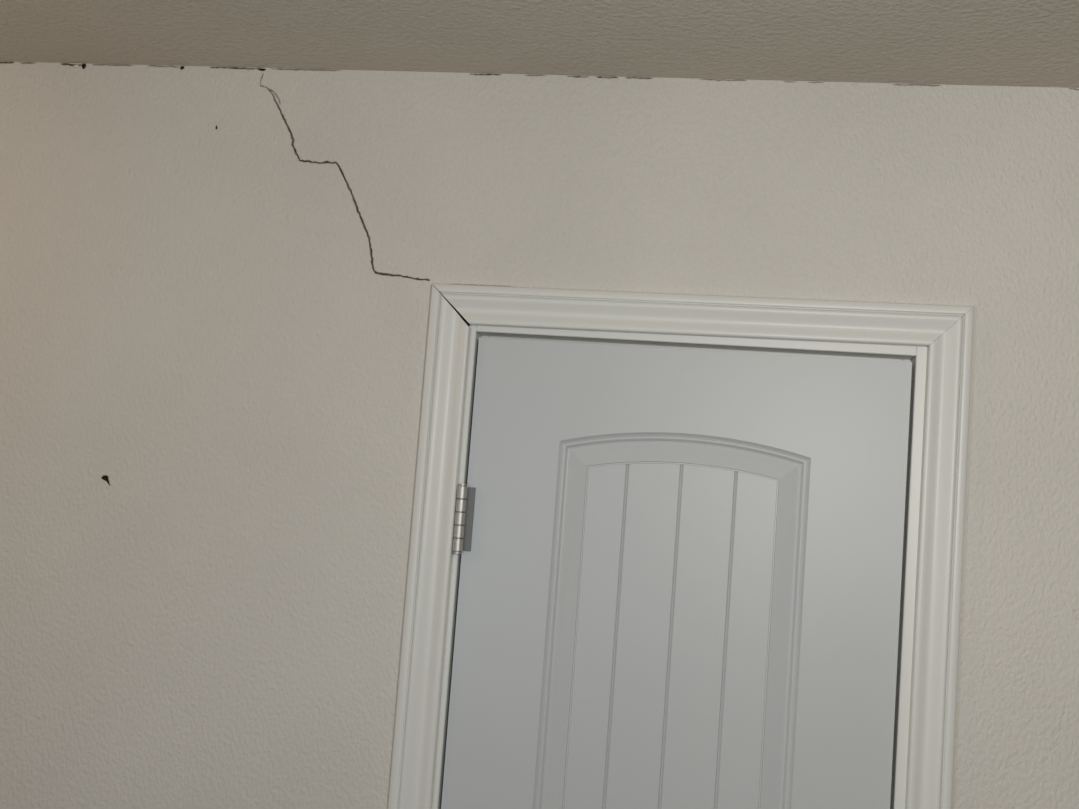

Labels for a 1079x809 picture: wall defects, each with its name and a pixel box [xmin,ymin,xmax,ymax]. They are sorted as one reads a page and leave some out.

crack [211,67,430,281]